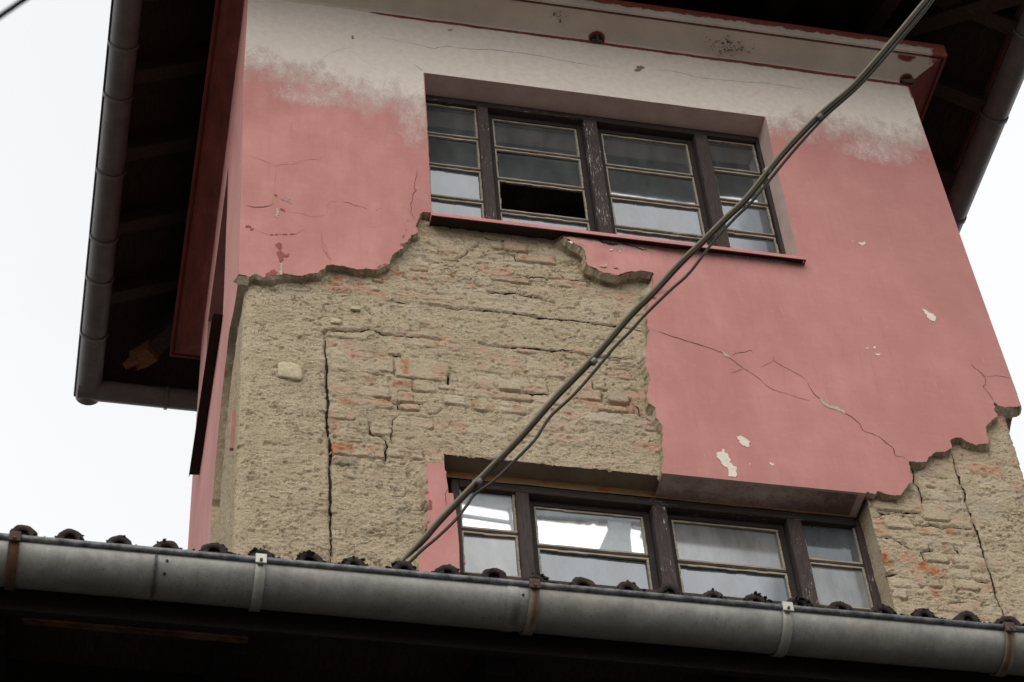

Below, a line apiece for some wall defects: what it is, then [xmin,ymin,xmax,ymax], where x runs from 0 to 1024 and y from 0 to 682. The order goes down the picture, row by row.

damp [244,0,927,159]
crack [324,310,419,562]
crack [369,403,439,461]
spalling [210,212,664,570]
peeling [716,449,750,477]
crack [846,413,1003,613]
spalling [854,402,1024,624]